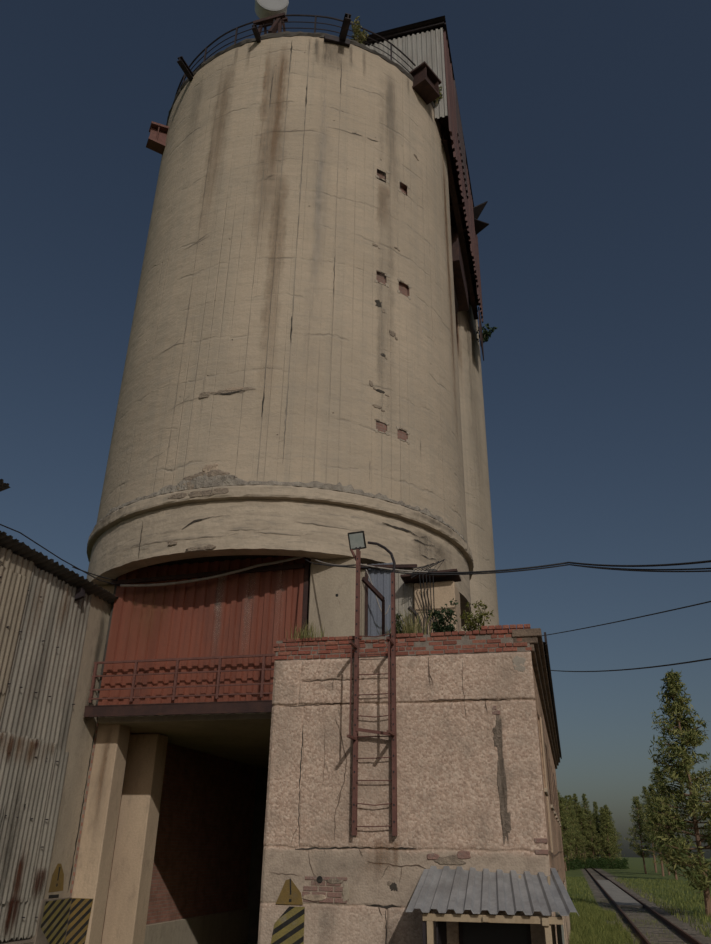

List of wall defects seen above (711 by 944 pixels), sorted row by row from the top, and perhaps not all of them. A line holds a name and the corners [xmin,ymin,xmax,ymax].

corrosion [5,857,24,929]
flaking render [302,876,350,903]